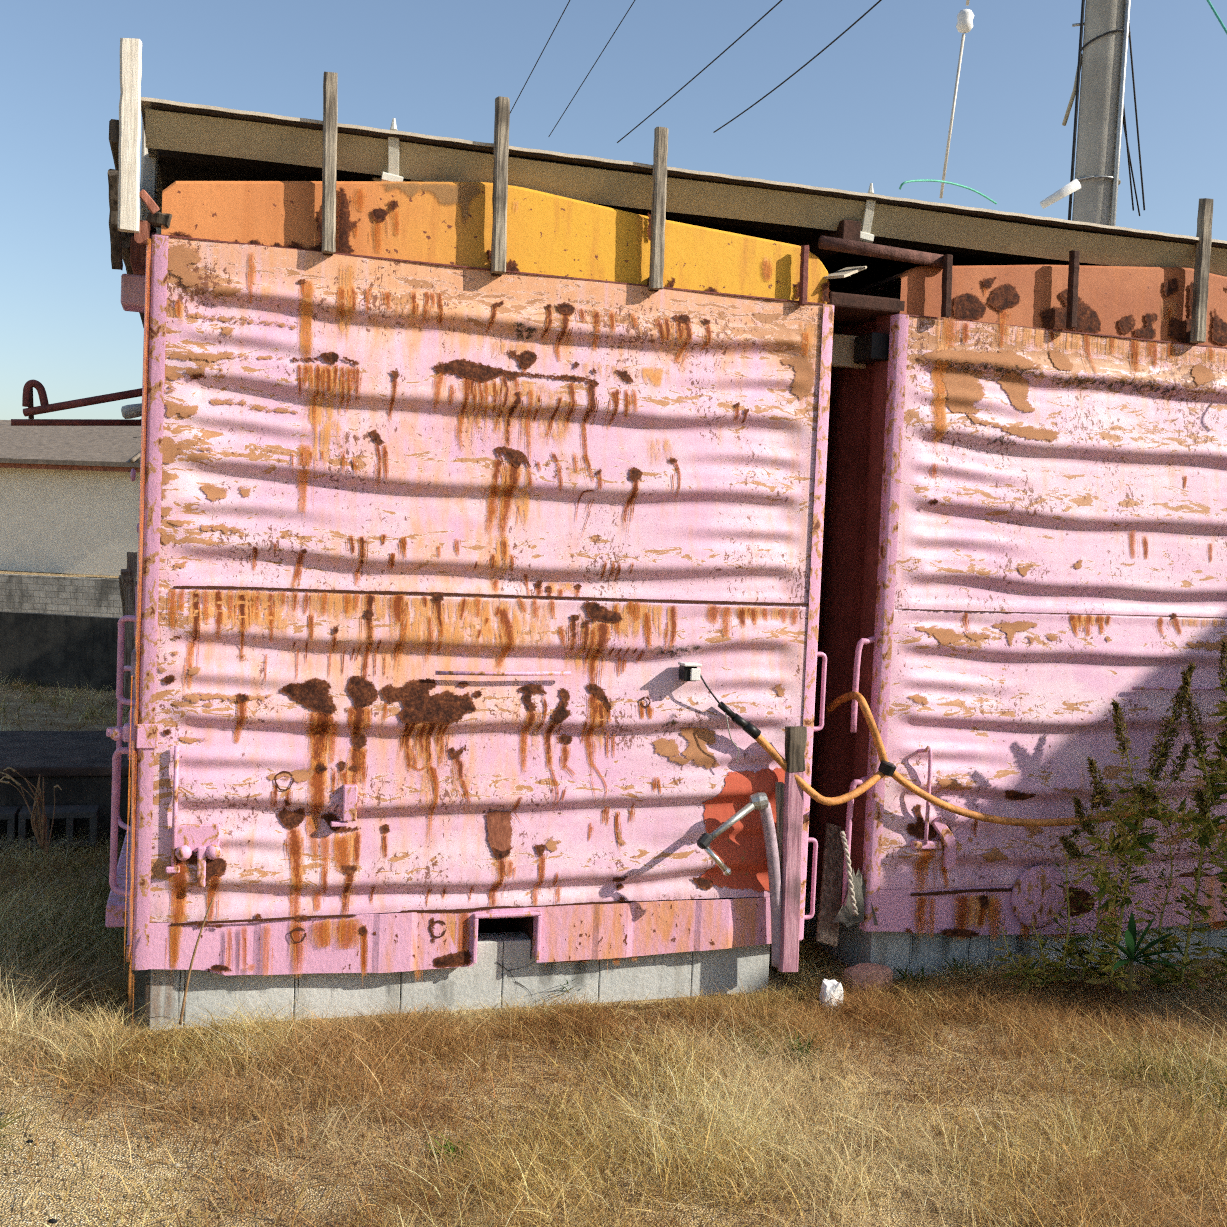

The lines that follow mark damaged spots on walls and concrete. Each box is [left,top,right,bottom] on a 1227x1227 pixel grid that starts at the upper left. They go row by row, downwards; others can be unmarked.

corrosion [232,187,443,334]
corrosion [292,279,362,510]
peeling [919,347,1074,443]
corrosion [931,277,1193,442]
peeling [1190,363,1215,386]
corrosion [434,301,700,846]
peeling [908,694,933,705]
peeling [914,620,1062,647]
corrosion [169,854,227,967]
corrosion [271,640,482,924]
corrosion [486,797,522,907]
peeling [651,727,785,893]